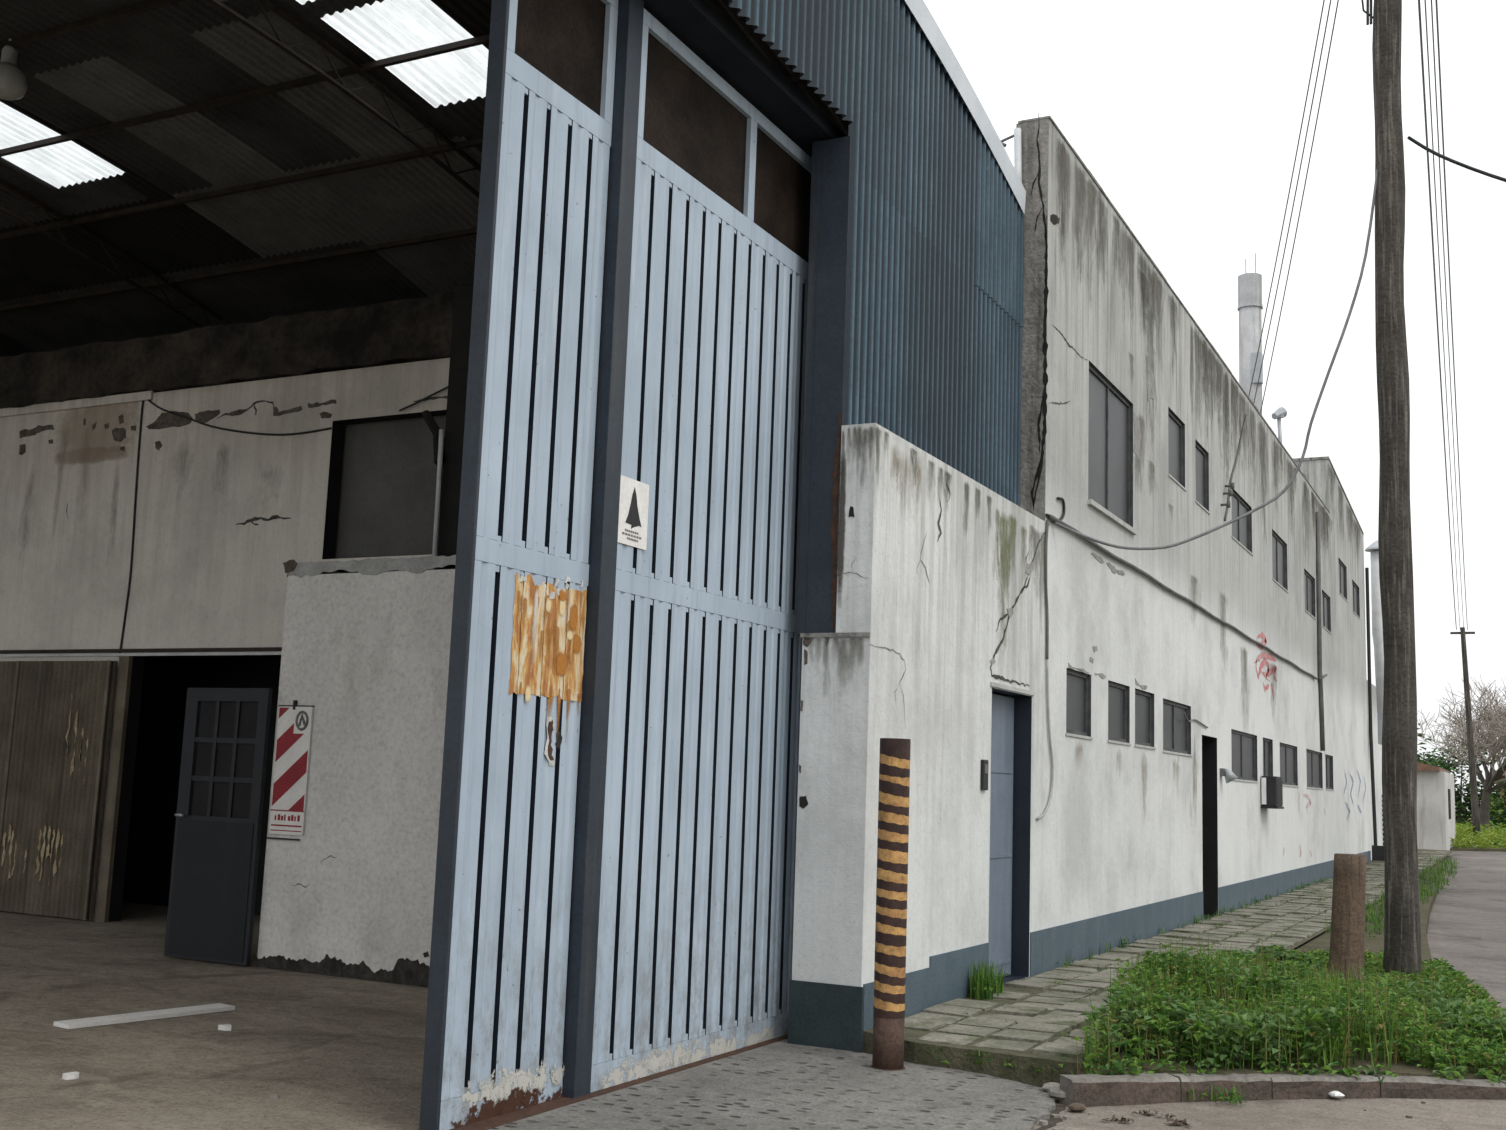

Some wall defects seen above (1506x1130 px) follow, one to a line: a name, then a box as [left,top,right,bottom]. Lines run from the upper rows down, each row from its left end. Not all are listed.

leakage [1058,143,1360,545]
spalling [273,400,336,419]
crack [990,112,1087,687]
spalling [19,425,54,455]
crack [236,515,291,525]
leakage [837,427,888,592]
leakage [911,449,1045,611]
spalling [255,951,430,987]
rust [452,1087,564,1128]